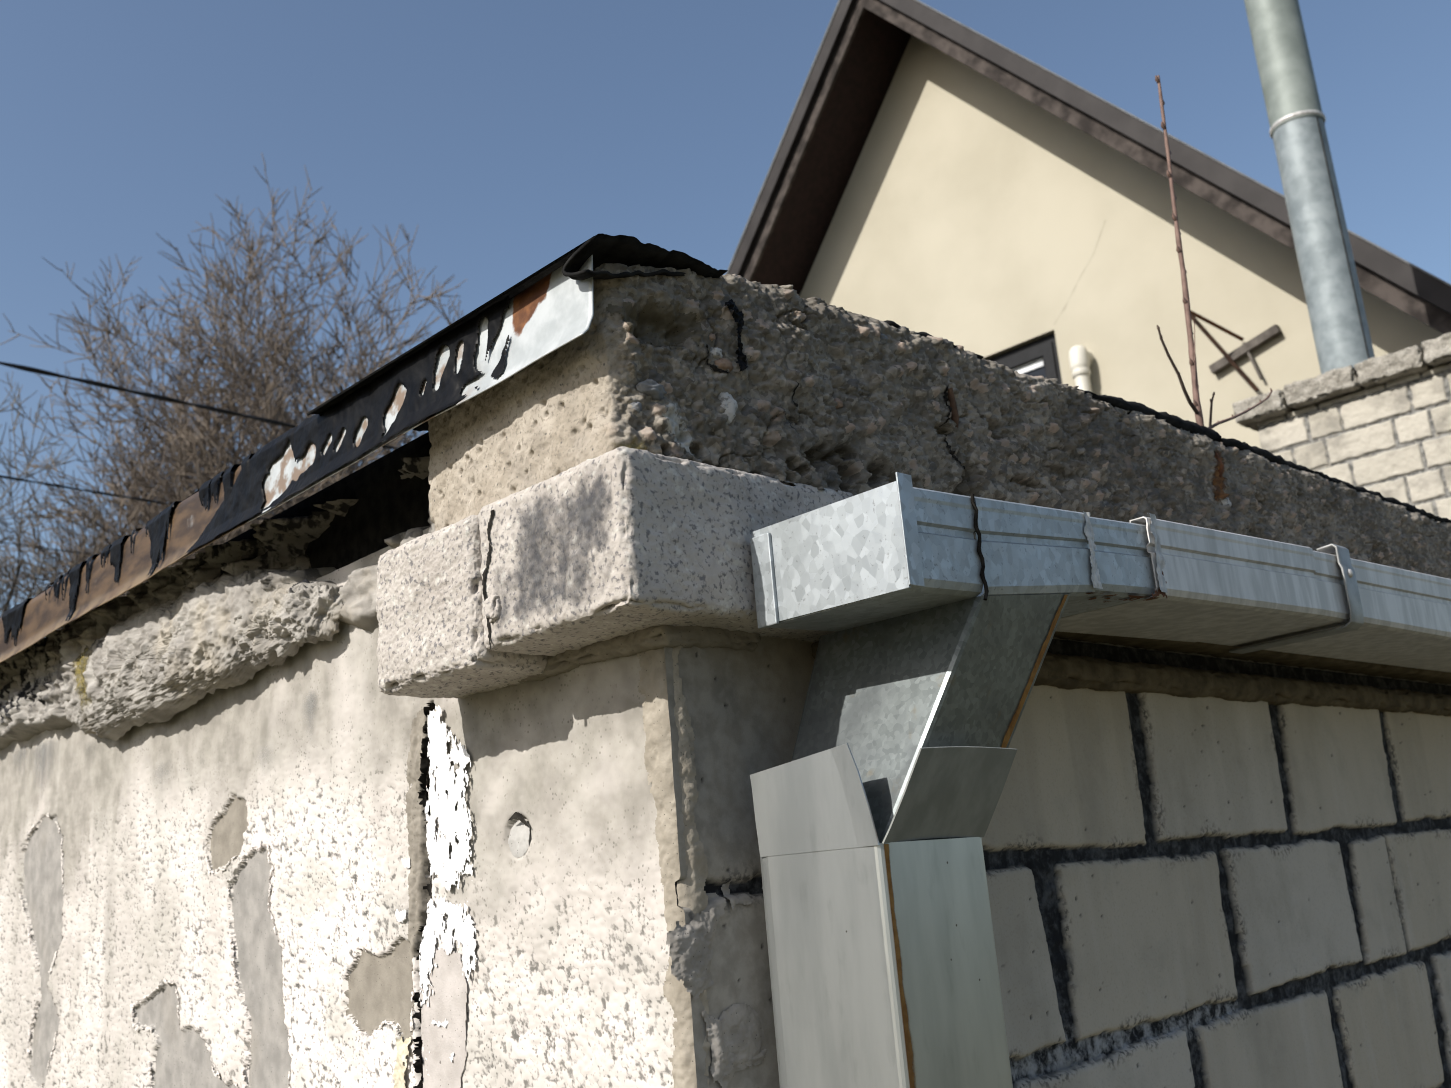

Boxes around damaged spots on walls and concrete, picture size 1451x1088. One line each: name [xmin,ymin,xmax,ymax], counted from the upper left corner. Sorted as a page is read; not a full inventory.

crack [482,510,494,650]
leakage [500,477,610,619]
corrosion [1212,450,1229,501]
peeling [18,813,65,1088]
peeling [130,795,292,1088]
peeling [343,705,477,1046]